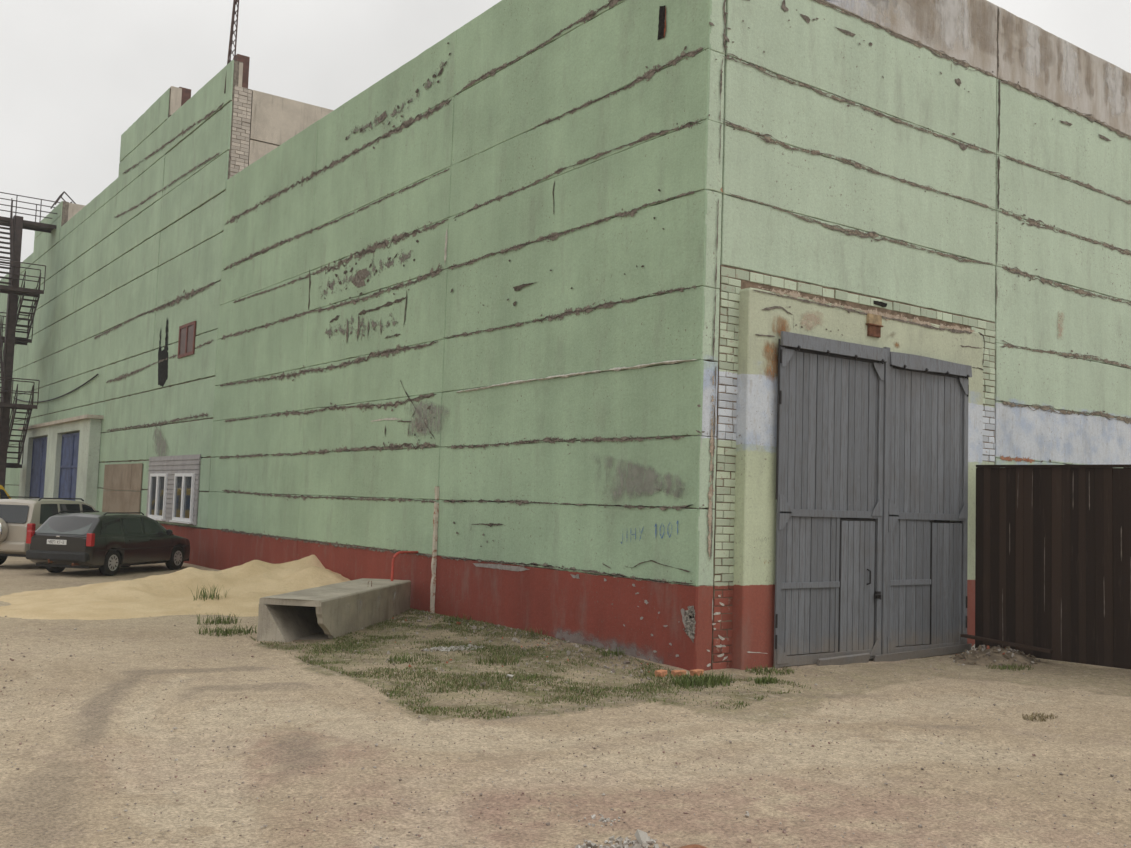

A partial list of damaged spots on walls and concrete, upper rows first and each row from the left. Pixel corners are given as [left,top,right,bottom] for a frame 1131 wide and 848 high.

peeling [781,0,873,46]
damp [825,0,901,26]
damp [936,0,968,48]
damp [1028,26,1040,75]
crack [960,8,1001,370]
peeling [320,240,419,302]
corrosion [765,318,787,378]